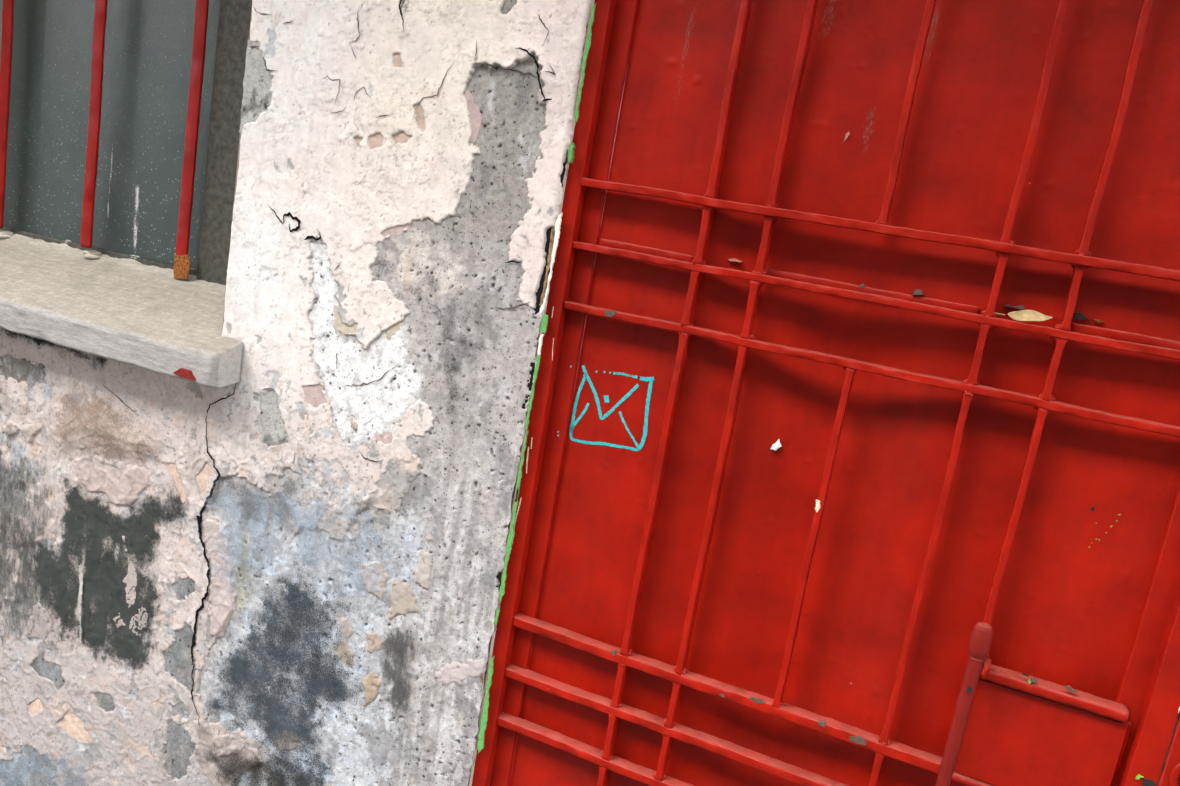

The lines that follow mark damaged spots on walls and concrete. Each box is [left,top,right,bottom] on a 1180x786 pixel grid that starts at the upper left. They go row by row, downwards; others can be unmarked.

spalling [501,0,517,14]
spalling [239,39,274,133]
crack [324,9,556,118]
peeling [575,3,597,123]
peeling [568,142,576,163]
damp [1,328,107,370]
damp [56,392,160,462]
spalling [162,55,548,786]
peeling [73,460,151,507]
crack [191,384,273,725]
damp [196,473,388,786]
peeling [94,692,116,712]